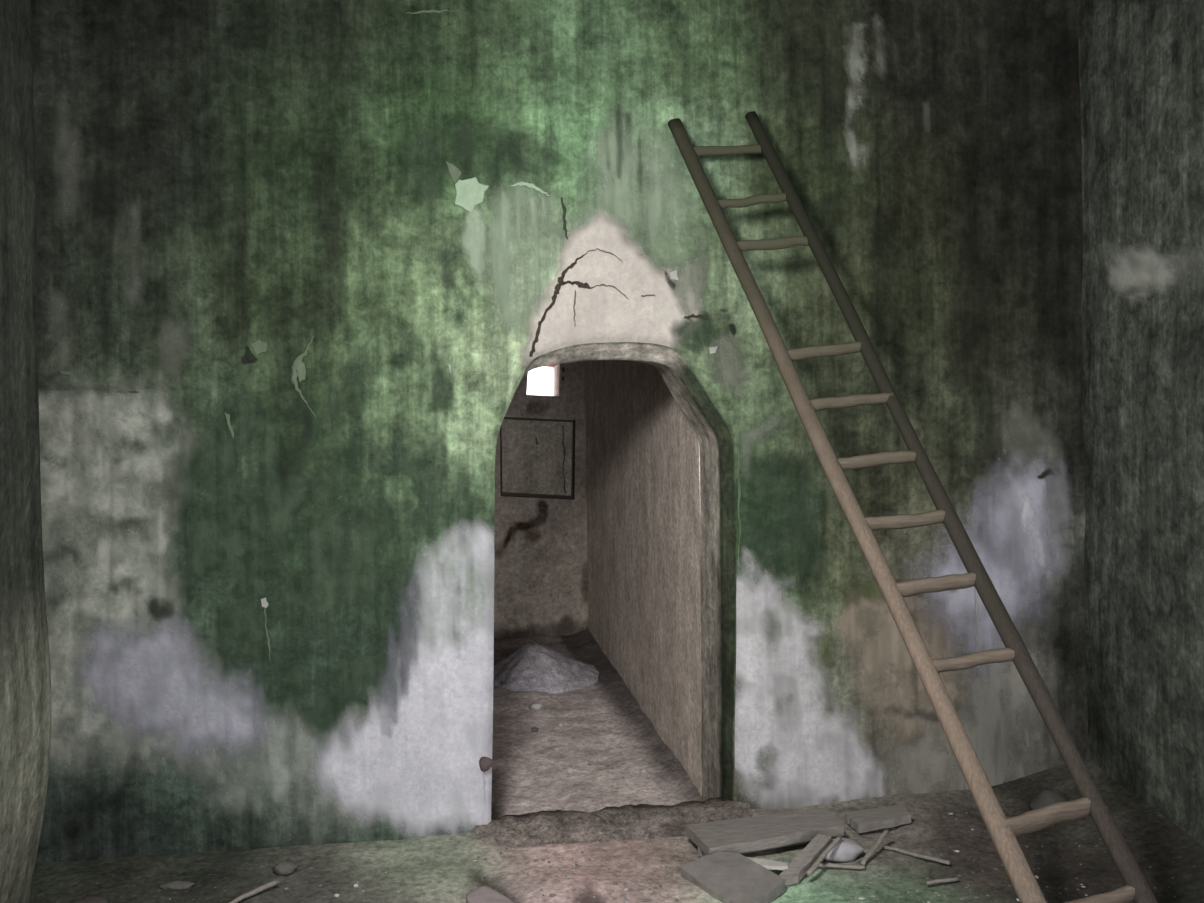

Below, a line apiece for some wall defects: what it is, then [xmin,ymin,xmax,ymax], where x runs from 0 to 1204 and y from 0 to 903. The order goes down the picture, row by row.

flaking render [446,161,705,363]
crack [529,197,656,357]
water stain [389,581,417,703]